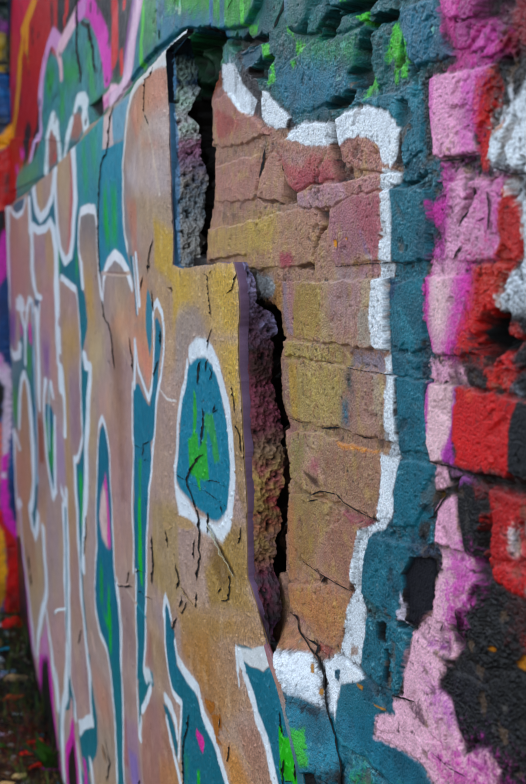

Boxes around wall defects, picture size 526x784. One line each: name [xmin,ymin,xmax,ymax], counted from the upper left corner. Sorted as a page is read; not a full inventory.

spalling [202,24,230,47]
crack [96,108,113,273]
flaking render [172,38,209,267]
crack [196,271,236,383]
crack [115,386,241,629]
crack [308,490,374,519]
crack [279,755,296,784]
crack [290,612,342,784]